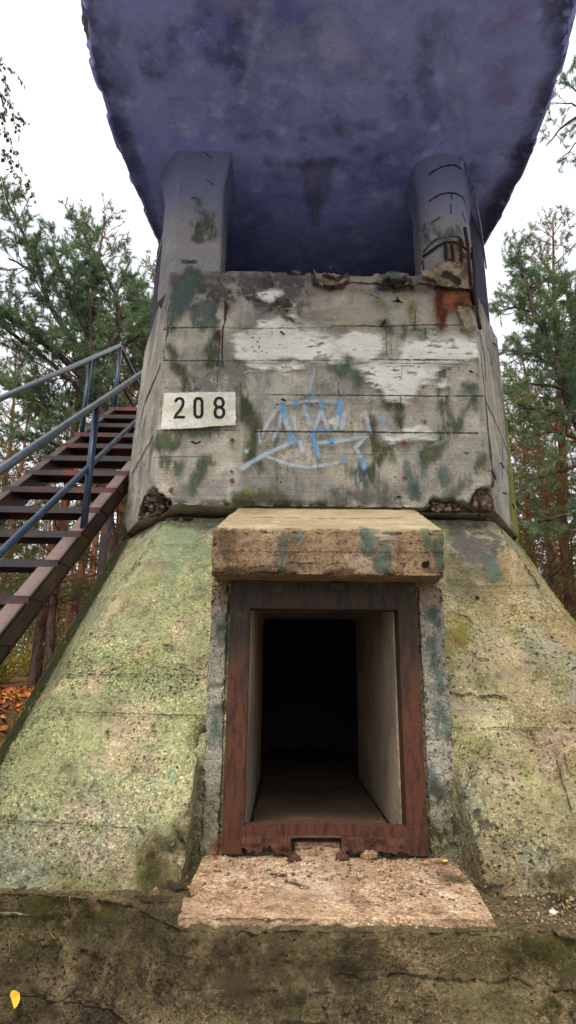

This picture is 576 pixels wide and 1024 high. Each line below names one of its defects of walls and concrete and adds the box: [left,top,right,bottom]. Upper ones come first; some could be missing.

crack [128,160,508,508]
peeling [231,227,482,403]
rust [434,286,470,329]
spalling [136,488,194,522]
spalling [426,488,496,520]